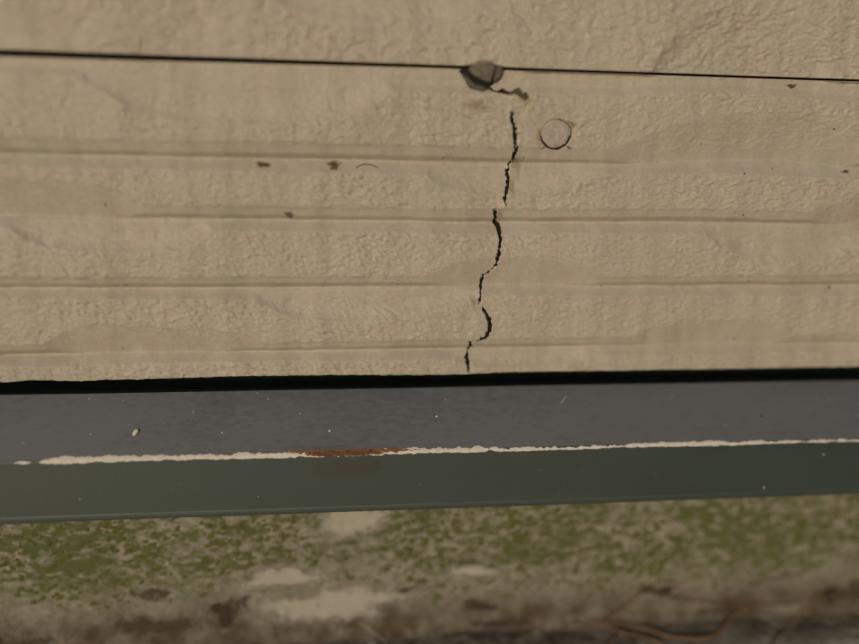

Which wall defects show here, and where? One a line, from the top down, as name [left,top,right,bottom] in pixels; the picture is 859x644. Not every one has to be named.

spalling [459,60,533,107]
crack [464,112,521,375]
corrosion [286,448,416,457]
leakage [140,588,168,602]
leakage [111,616,203,634]
leakage [208,595,250,628]
leakage [464,599,523,628]